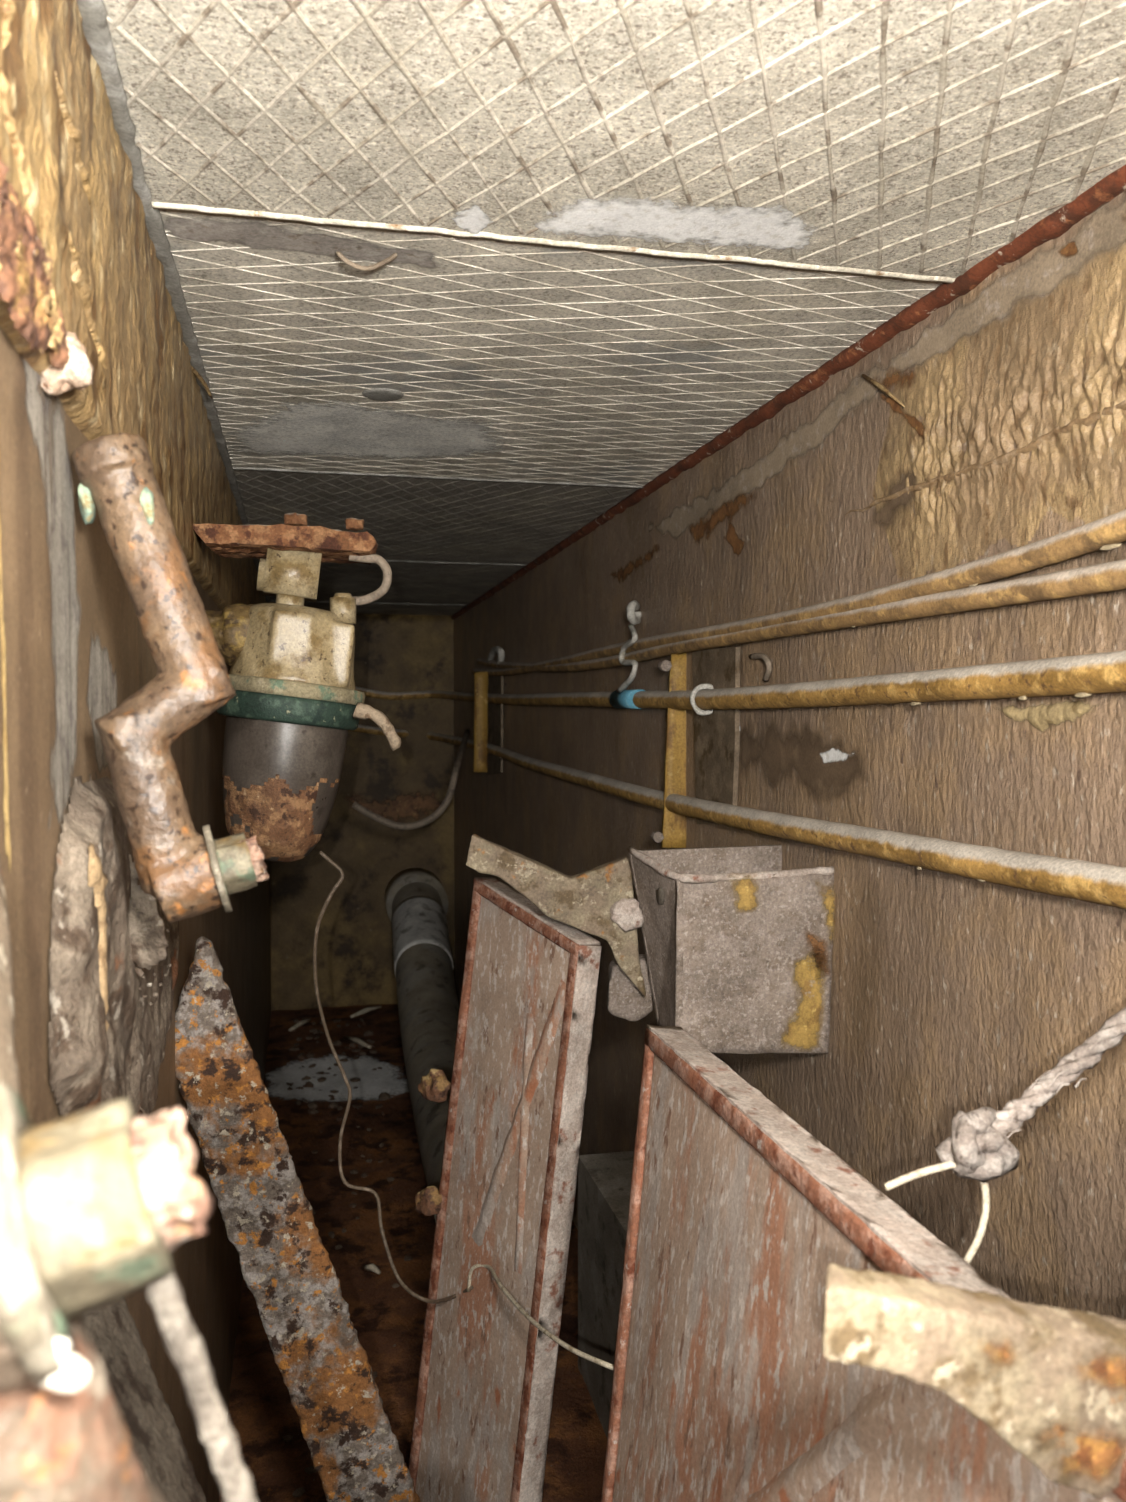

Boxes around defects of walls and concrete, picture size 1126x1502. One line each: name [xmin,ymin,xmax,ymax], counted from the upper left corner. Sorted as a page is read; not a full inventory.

damp [453,205,492,235]
damp [536,198,813,249]
corrosion [1059,241,1078,257]
corrosion [876,371,924,438]
corrosion [690,494,753,555]
damp [740,723,861,797]